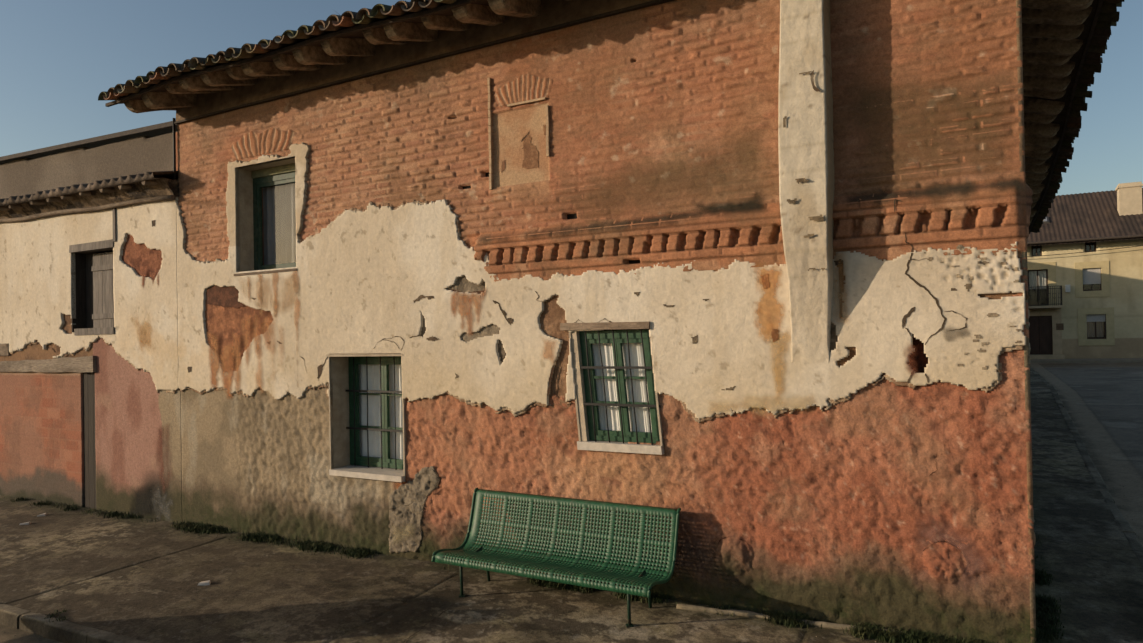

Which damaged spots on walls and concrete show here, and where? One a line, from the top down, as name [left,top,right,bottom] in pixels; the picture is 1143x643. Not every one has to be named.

flaking render [122,234,163,286]
crack [894,199,968,344]
flaking render [205,285,282,397]
flaking render [535,291,571,408]